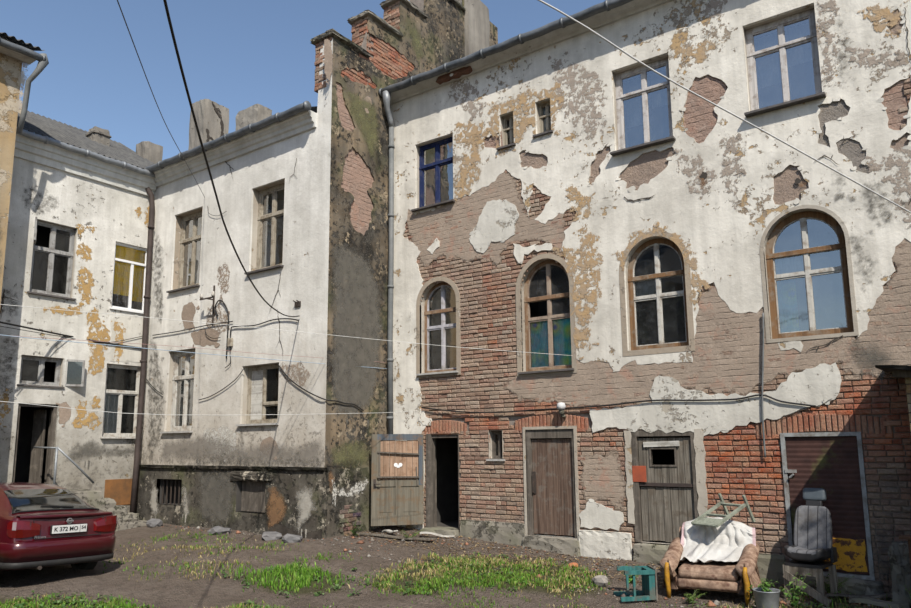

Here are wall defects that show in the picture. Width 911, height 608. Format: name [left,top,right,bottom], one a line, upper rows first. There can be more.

peeling [0,55,29,133]
damp [349,92,378,153]
spalling [340,148,374,235]
peeling [43,224,129,375]
damp [333,245,382,424]
spalling [403,0,911,598]
damp [148,347,318,465]
damp [199,473,234,528]
damp [297,490,313,538]
damp [332,479,368,507]